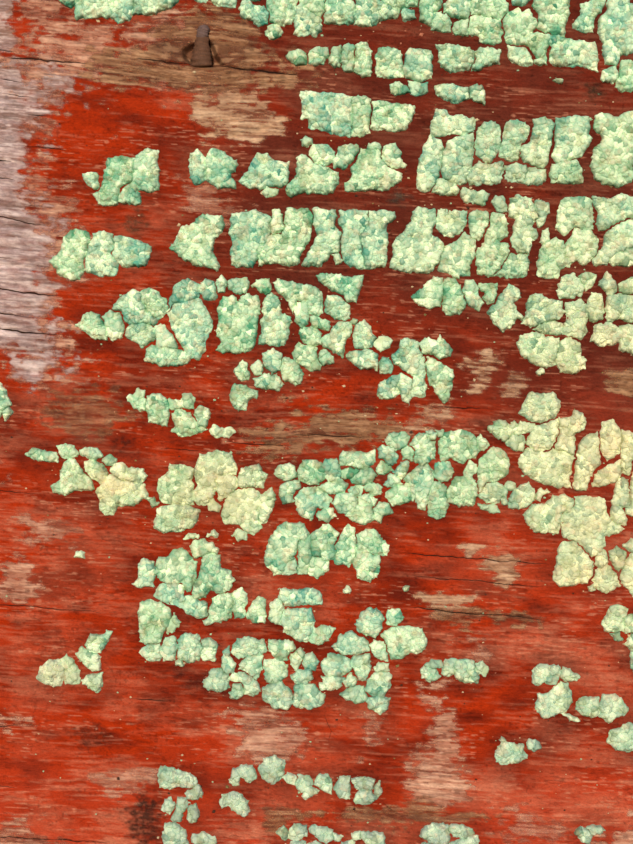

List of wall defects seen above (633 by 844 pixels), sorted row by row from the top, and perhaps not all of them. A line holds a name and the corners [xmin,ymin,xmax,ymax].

crack [222,66,297,75]
peeling [0,0,633,597]
crack [229,434,355,447]
crack [0,604,98,613]
crack [410,607,540,620]
crack [413,575,540,587]
crack [411,553,545,564]
peeling [36,629,113,693]
peeling [132,529,427,823]
peeling [402,585,542,844]
peeling [531,663,633,753]
peeling [145,765,217,844]